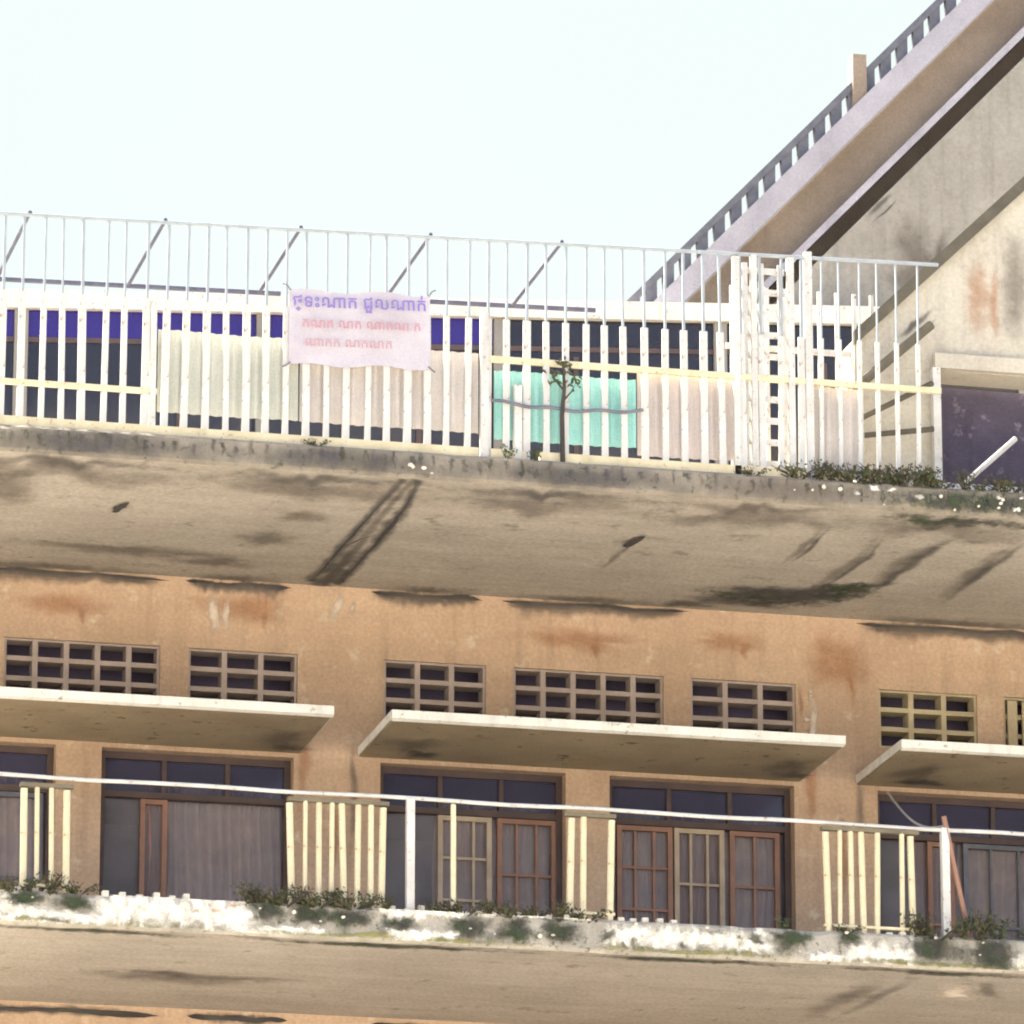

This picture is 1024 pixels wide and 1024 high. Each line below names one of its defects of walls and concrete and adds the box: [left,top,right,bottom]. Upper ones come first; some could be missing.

leakage [834,554,873,578]
leakage [886,548,936,584]
leakage [966,557,1007,585]